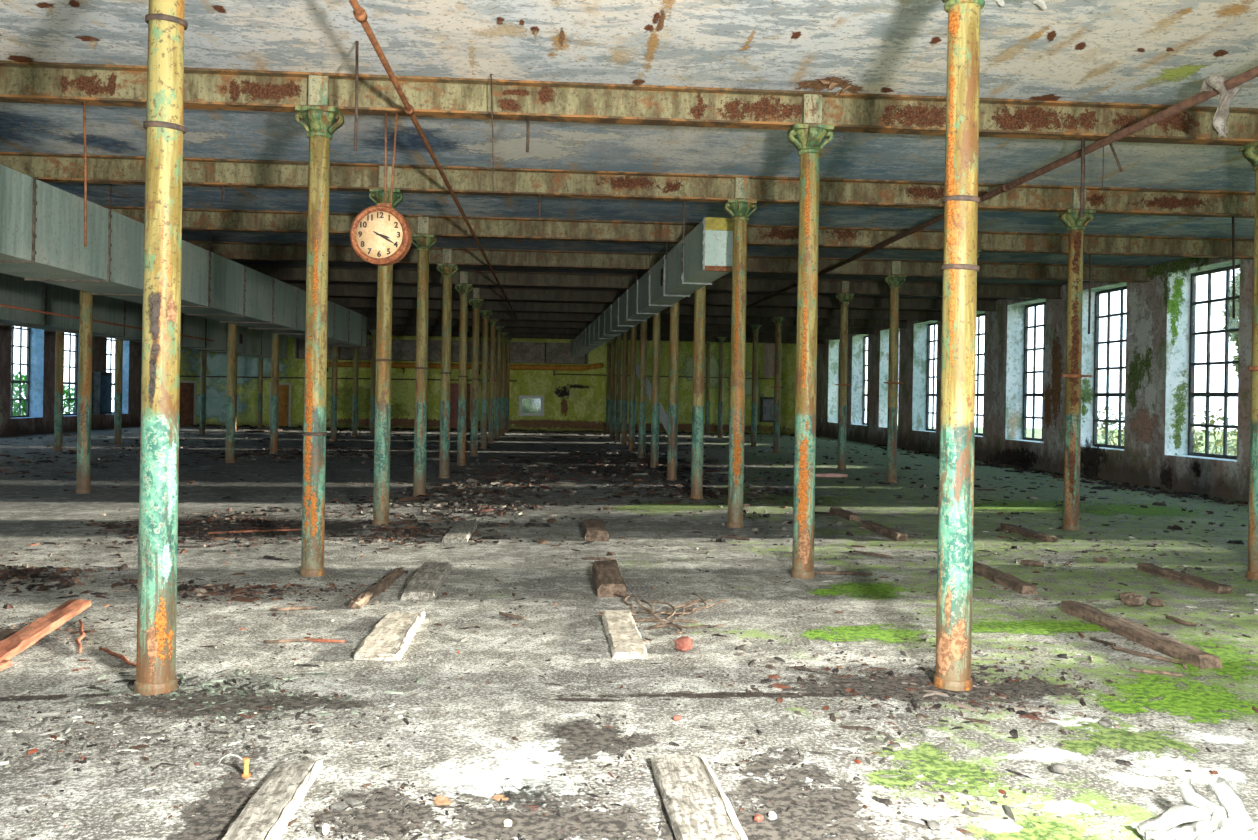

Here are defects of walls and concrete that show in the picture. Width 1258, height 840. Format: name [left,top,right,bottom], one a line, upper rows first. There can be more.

damp [0,111,136,152]
rust [219,78,308,103]
damp [367,127,457,151]
rust [688,92,802,121]
peeling [790,76,865,96]
rust [988,94,1141,132]
damp [1163,272,1178,345]
peeling [1127,285,1160,444]
rust [303,228,319,550]
damp [1172,421,1182,455]
peeling [166,441,177,522]
peeling [161,538,172,589]